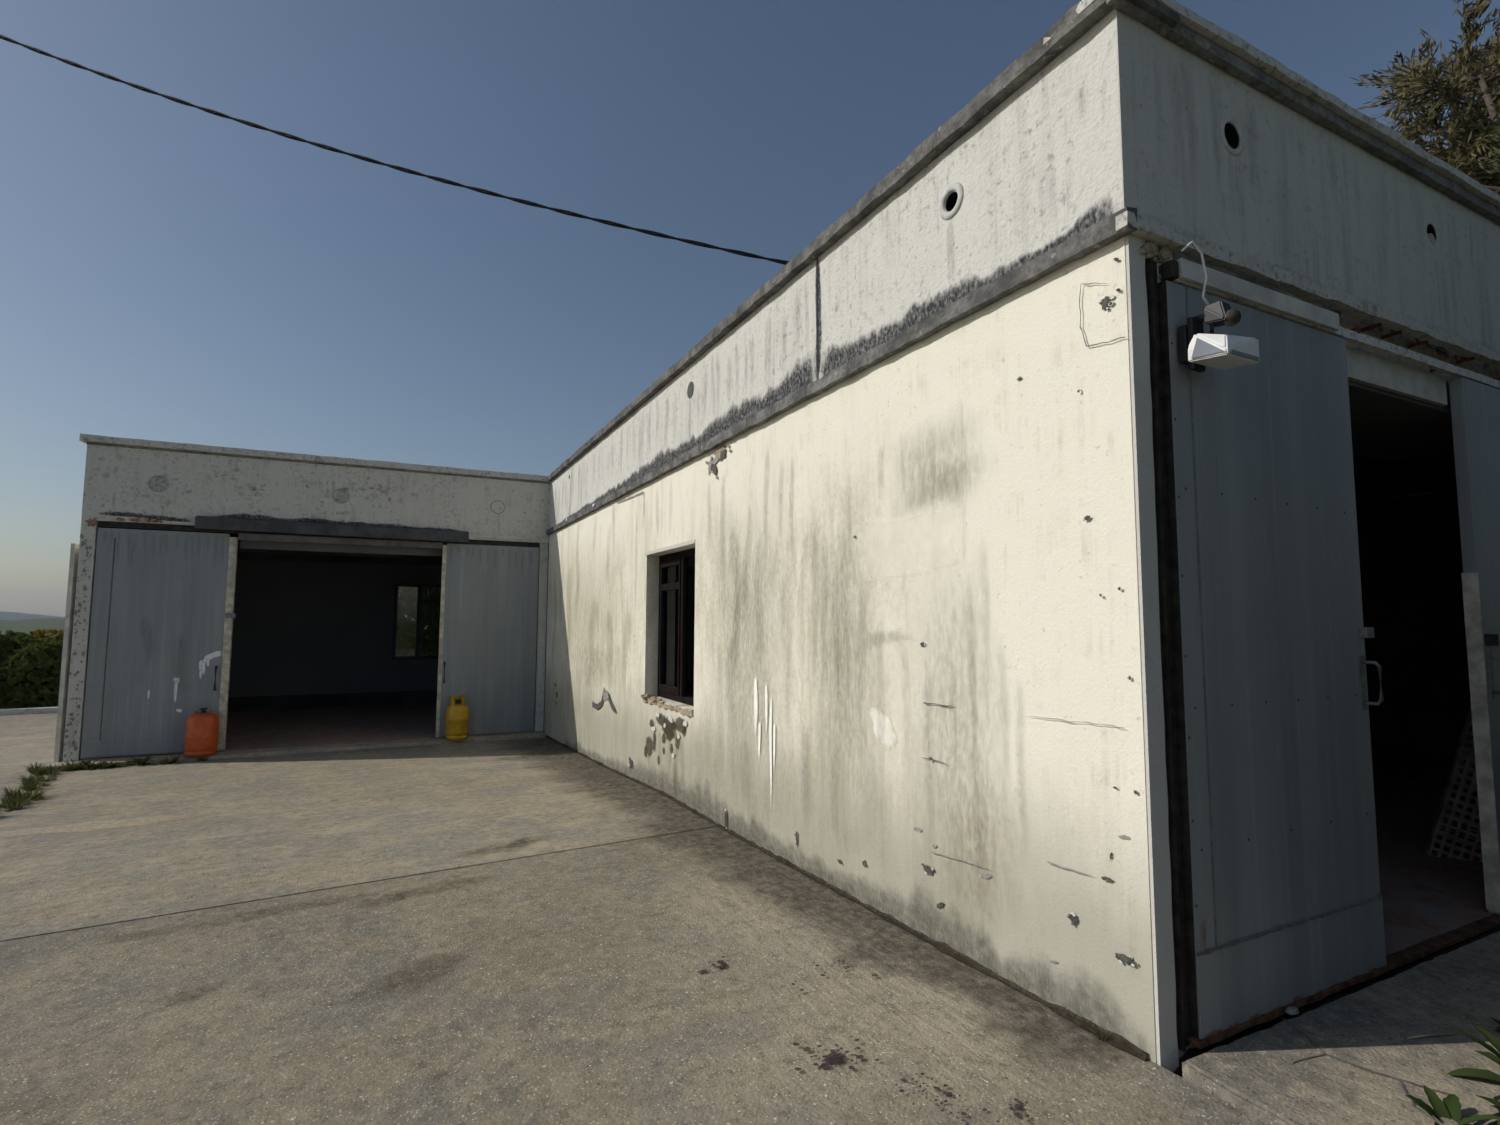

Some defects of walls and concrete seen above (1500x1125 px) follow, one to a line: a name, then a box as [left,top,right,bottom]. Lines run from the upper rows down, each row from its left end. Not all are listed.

leakage [563,203,1112,521]
peeling [63,534,92,758]
efflorescence [754,678,775,789]
leakage [511,739,1121,1052]